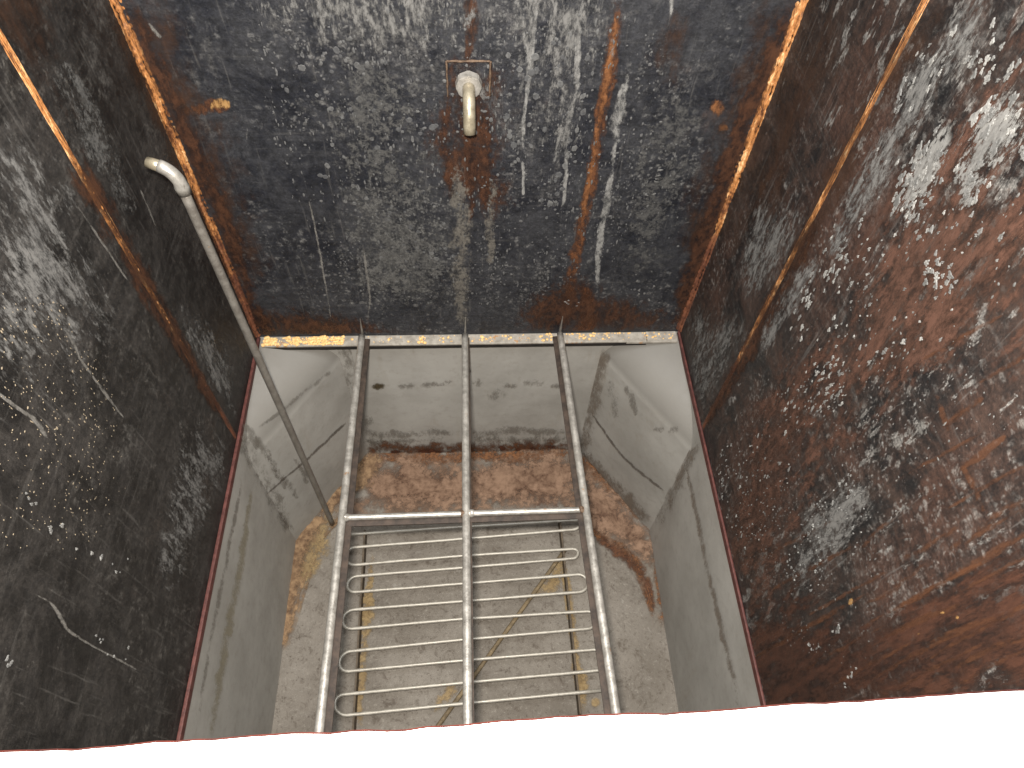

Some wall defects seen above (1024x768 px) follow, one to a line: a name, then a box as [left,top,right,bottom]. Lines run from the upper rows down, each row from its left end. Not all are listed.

rust [71,163,219,413]
rust [135,20,380,335]
rust [433,70,506,218]
leakage [521,6,538,145]
leakage [562,34,581,204]
rust [528,12,663,331]
leakage [595,173,614,283]
leakage [612,80,628,160]
rust [672,16,789,323]
rust [882,33,920,87]
rust [369,440,568,454]
rust [731,64,1024,707]